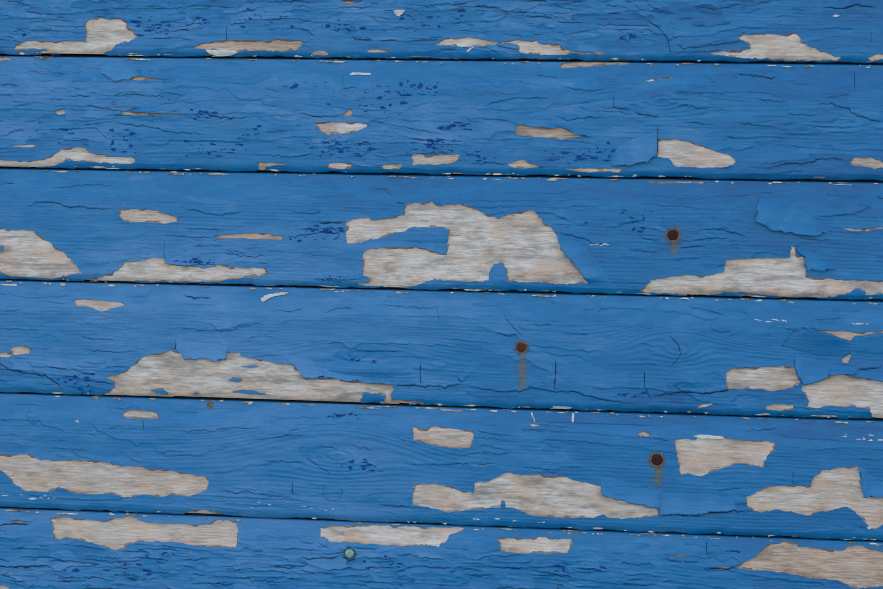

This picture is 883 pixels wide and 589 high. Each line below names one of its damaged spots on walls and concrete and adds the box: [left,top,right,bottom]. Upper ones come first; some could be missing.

crack [72,94,245,135]
crack [562,90,711,157]
peeling [0,228,294,302]
peeling [214,201,610,297]
peeling [638,246,883,305]
peeling [55,339,479,419]
crack [398,335,737,404]
peeling [0,454,209,500]
peeling [303,466,883,589]
crack [665,488,745,517]
crack [0,548,202,589]
crack [192,548,477,586]